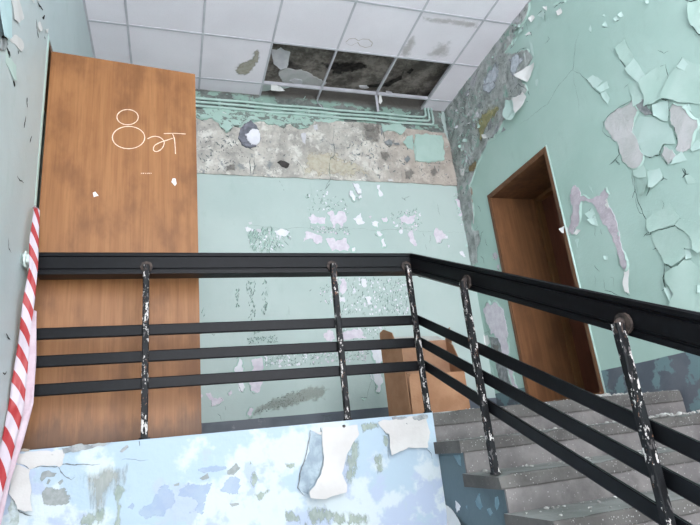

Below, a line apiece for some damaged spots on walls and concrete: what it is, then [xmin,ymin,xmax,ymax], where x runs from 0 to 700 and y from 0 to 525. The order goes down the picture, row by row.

peeling [0,0,24,54]
damp [236,51,259,75]
spalling [195,0,567,266]
peeling [602,38,700,196]
crack [632,164,680,302]
peeling [651,218,700,312]
peeling [233,350,383,372]
peeling [323,327,385,341]
peeling [483,300,511,356]
peeling [8,442,111,525]
peeling [297,425,359,499]
peeling [378,414,432,458]